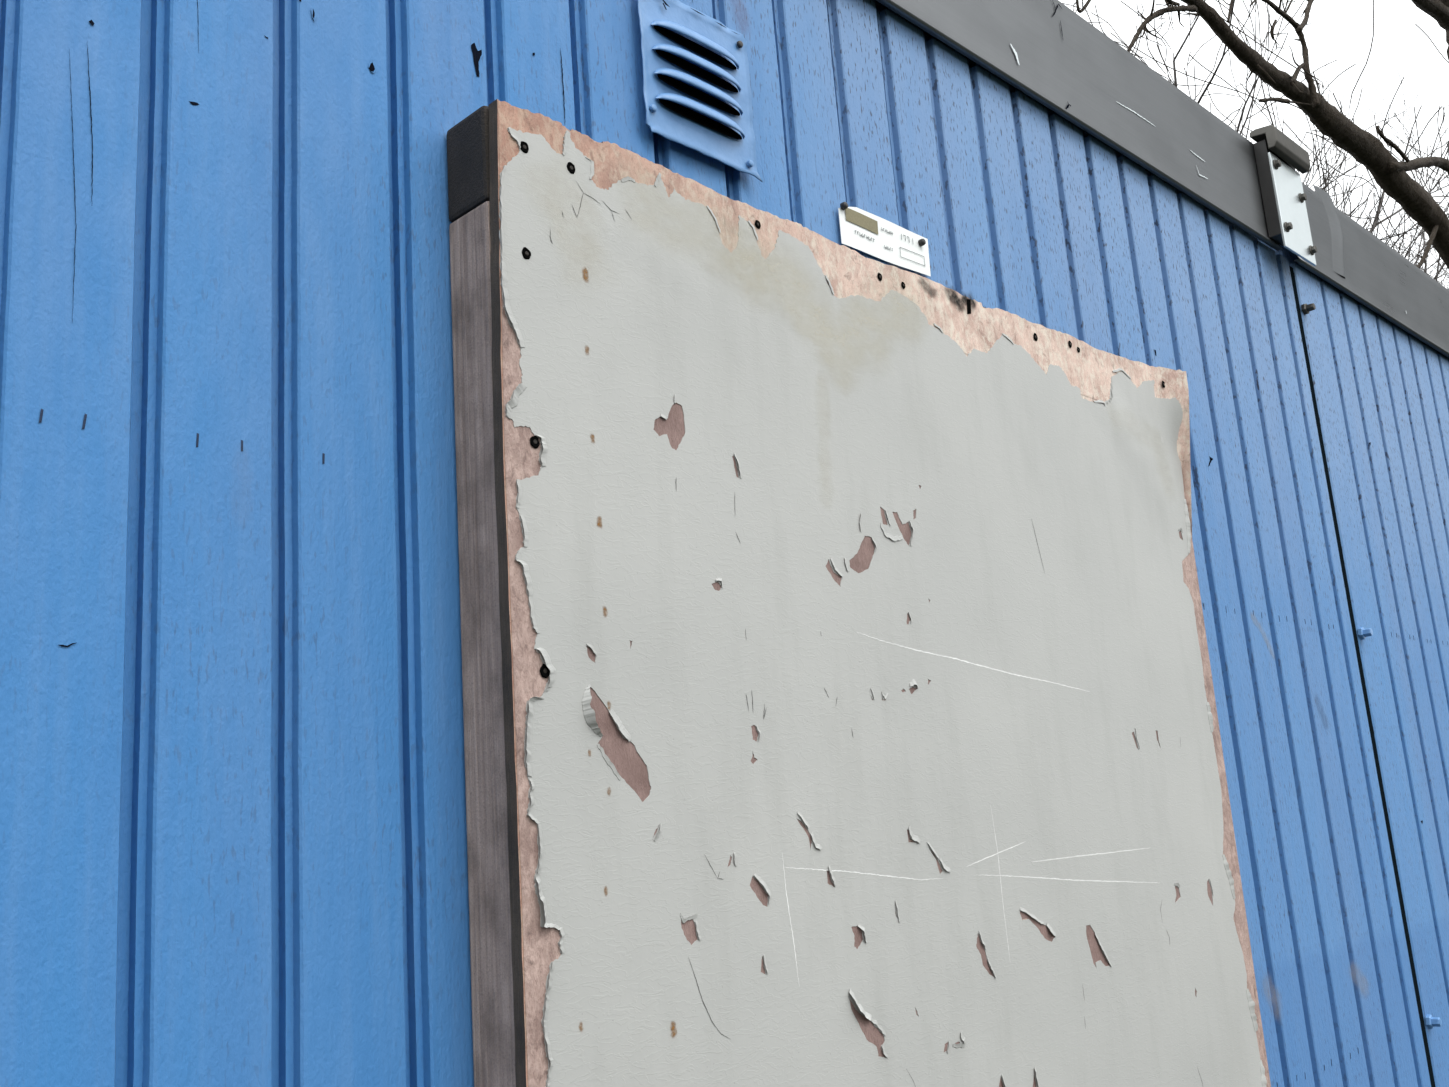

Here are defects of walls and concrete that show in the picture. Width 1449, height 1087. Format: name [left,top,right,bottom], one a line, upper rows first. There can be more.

spalling [471,42,483,77]
peeling [498,101,1189,1087]
peeling [1178,466,1271,1087]